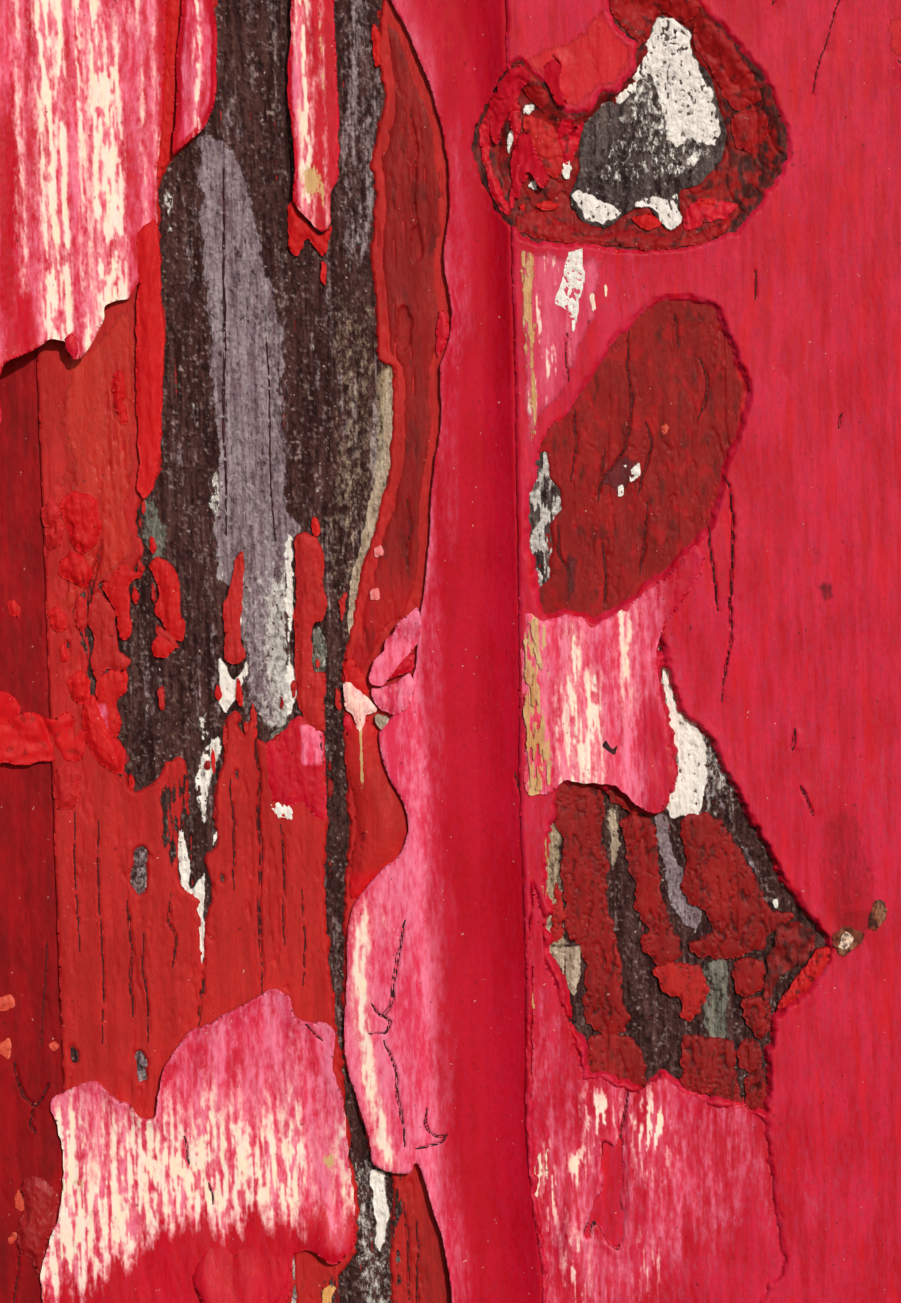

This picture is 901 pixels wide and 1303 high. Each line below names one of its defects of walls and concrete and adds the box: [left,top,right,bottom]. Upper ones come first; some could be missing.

crack [812,0,840,94]
spalling [471,0,788,331]
peeling [0,0,421,1303]
spalling [603,457,636,493]
crack [708,474,735,702]
crack [368,920,448,1149]
spalling [520,545,831,1303]